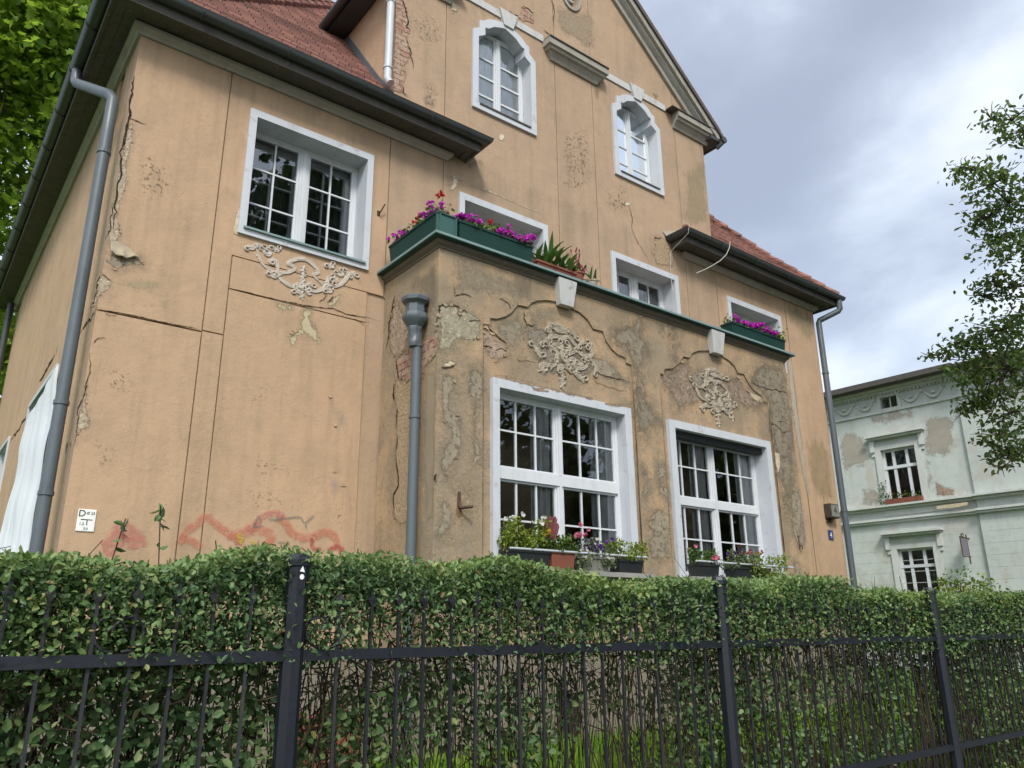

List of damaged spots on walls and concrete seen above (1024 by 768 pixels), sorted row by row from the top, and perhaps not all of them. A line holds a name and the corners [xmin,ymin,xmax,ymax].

flaking render [393,0,438,93]
crack [105,78,145,239]
crack [74,275,196,443]
peeling [277,303,321,345]
spalling [389,302,507,383]
spalling [65,383,90,453]
spalling [788,360,809,493]
peeling [925,417,953,464]
flaking render [936,483,968,509]